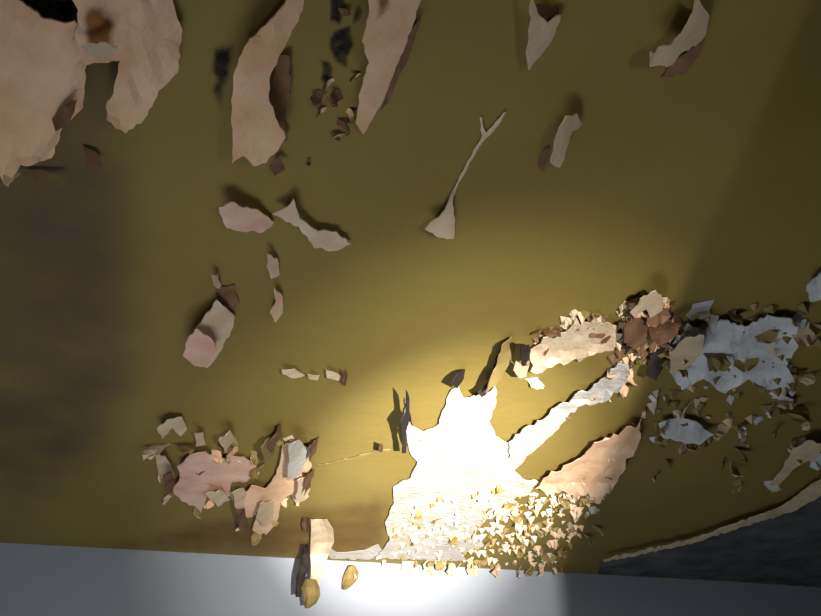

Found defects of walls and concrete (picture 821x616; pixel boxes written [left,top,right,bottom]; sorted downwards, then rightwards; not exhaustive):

peeling [0,0,182,192]
peeling [231,0,304,176]
peeling [310,0,421,142]
crack [450,112,506,196]
peeling [526,0,561,70]
peeling [538,113,582,172]
peeling [649,0,709,77]
peeling [219,198,352,251]
peeling [425,193,455,239]
peeling [183,274,240,368]
peeling [142,416,320,546]
flaking render [295,272,821,608]